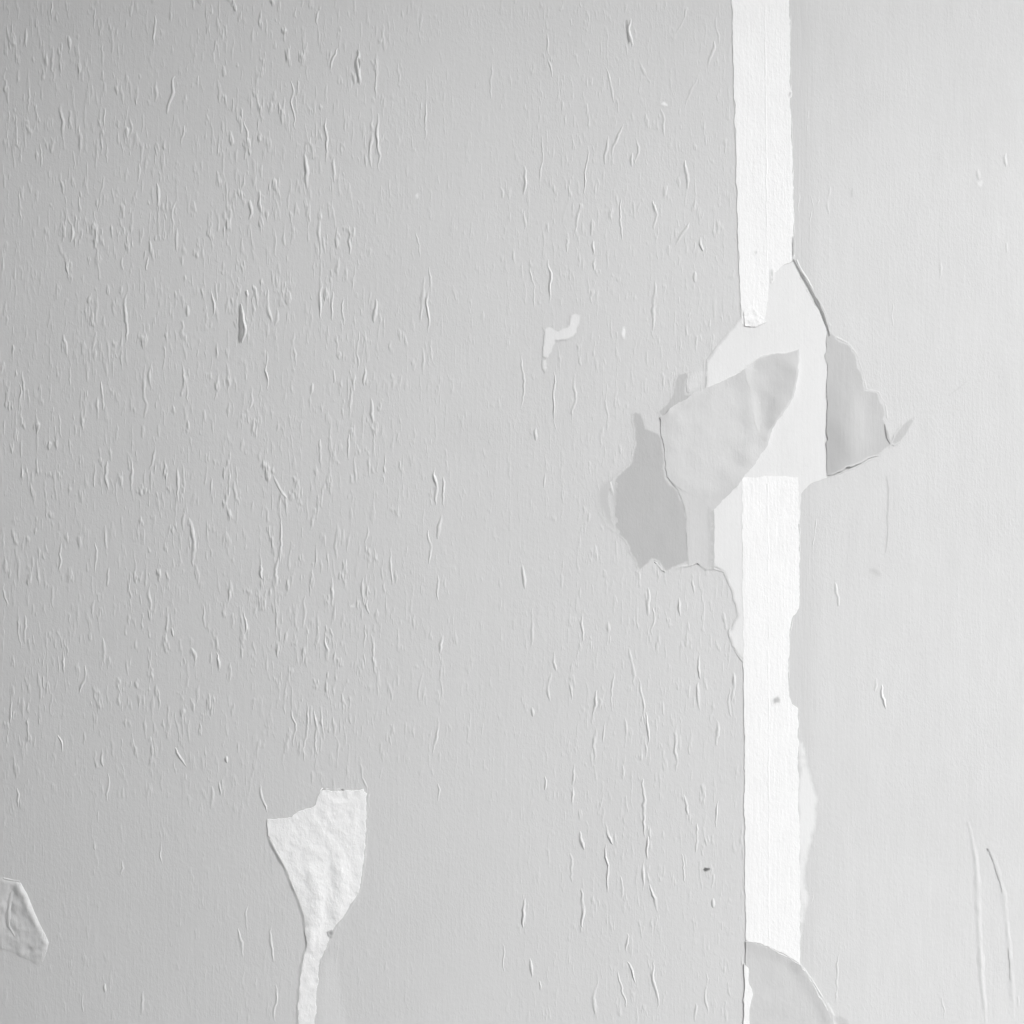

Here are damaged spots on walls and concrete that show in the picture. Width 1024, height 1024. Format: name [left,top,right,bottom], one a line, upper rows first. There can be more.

peeling [542,312,582,372]
peeling [594,0,917,1024]
peeling [267,787,370,1024]